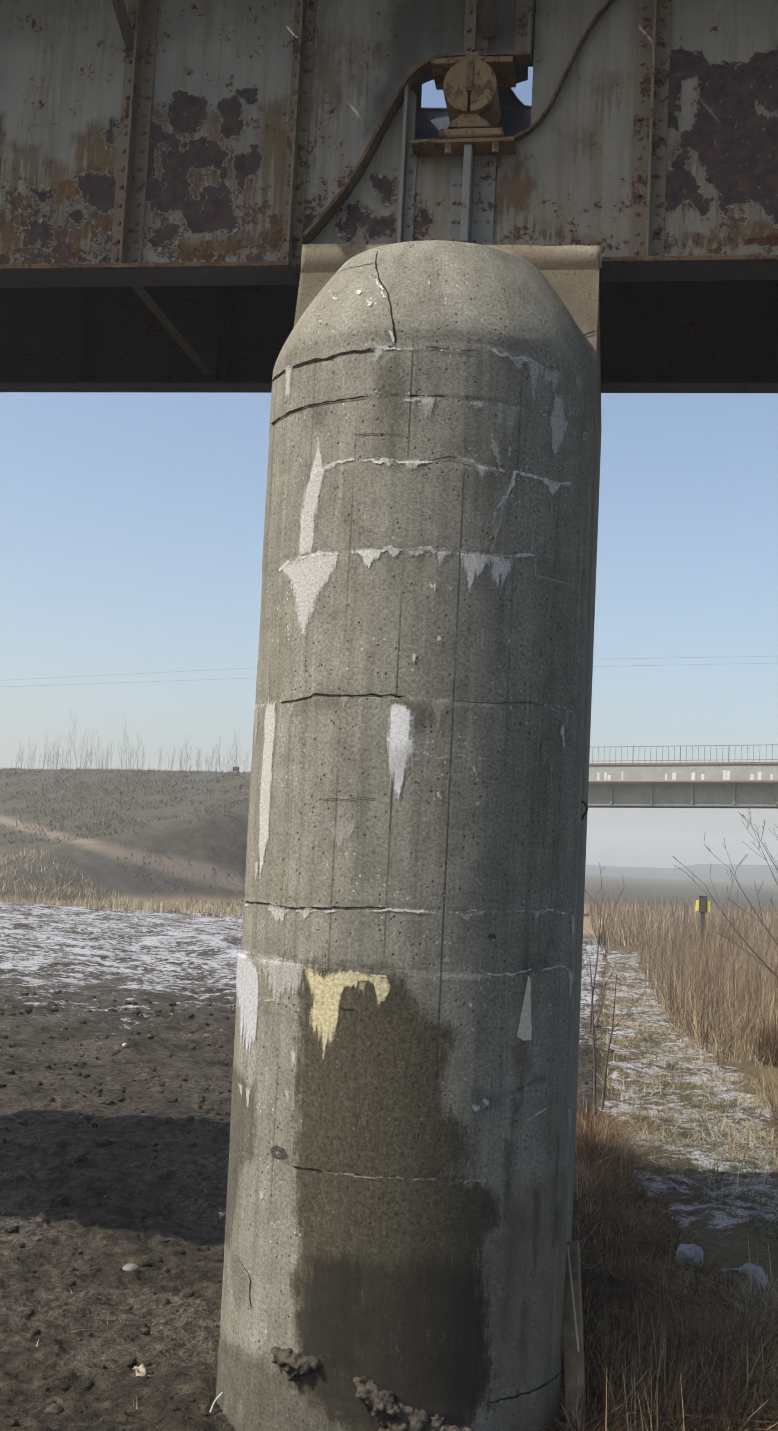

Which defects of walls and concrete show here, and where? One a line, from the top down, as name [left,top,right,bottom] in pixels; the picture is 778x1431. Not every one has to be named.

corrosion [664,222,778,250]
crack [271,251,476,424]
crack [355,433,459,465]
crack [280,693,404,703]
crack [456,700,573,762]
crack [245,901,386,909]
damp [216,950,500,1431]